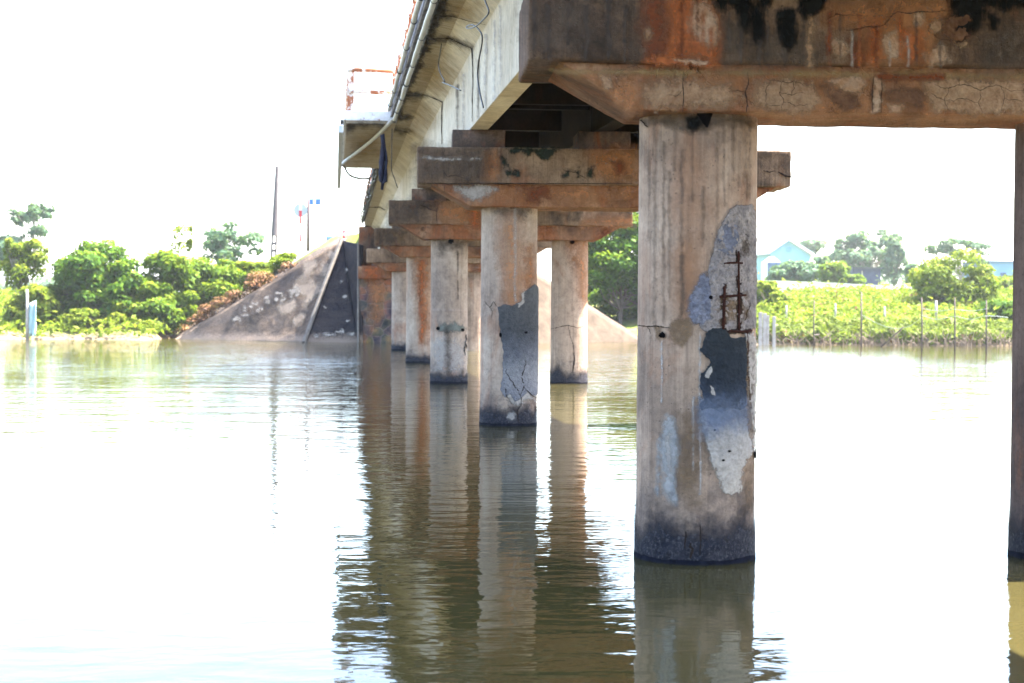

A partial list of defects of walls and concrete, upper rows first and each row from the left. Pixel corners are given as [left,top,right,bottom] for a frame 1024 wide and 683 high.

rust [646,0,722,68]
damp [713,0,827,75]
damp [950,0,1024,78]
crack [729,72,807,112]
damp [871,72,947,114]
crack [930,78,1022,110]
rust [438,146,637,226]
rust [413,257,431,342]
spalling [688,204,758,458]
damp [634,511,756,565]